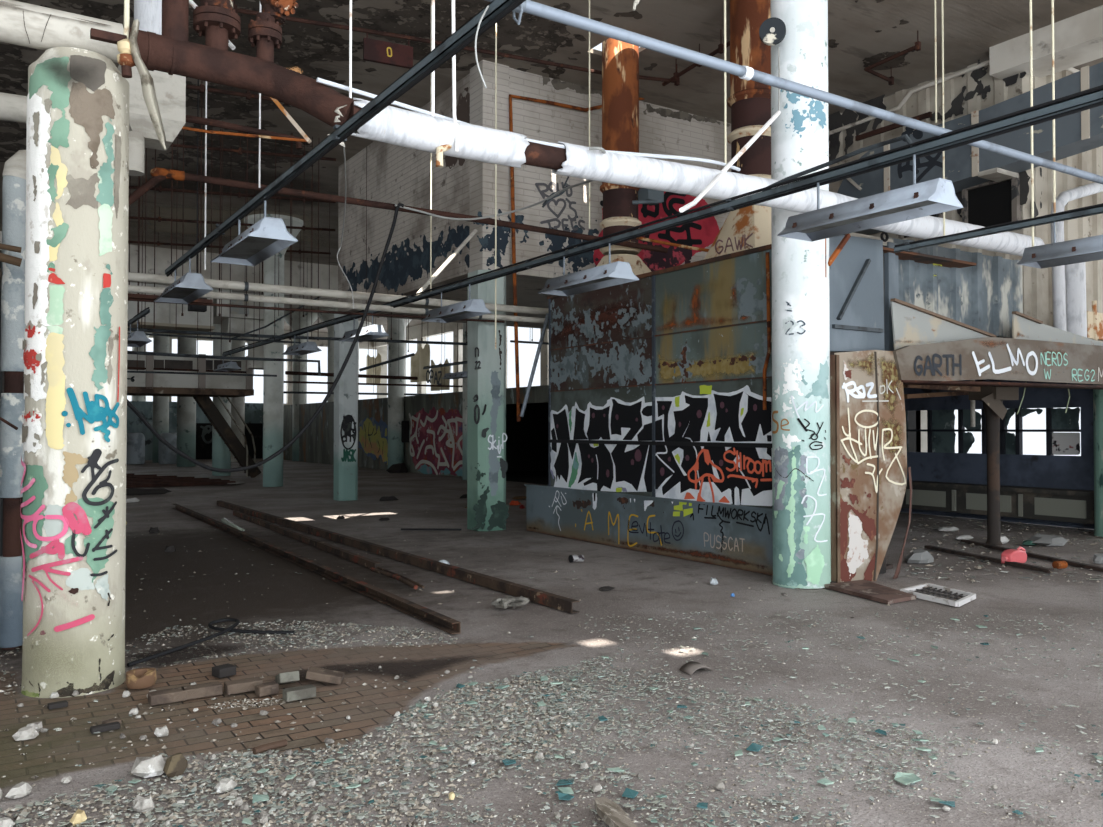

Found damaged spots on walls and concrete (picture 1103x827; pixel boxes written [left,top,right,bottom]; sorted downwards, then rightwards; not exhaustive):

peeling [15,0,134,28]
peeling [274,0,491,97]
peeling [439,3,602,96]
peeling [152,77,326,172]
peeling [780,86,886,161]
peeling [343,209,599,296]
peeling [0,42,122,601]
rust [556,304,644,340]
rust [664,286,725,329]
rust [658,342,756,382]
peeling [773,434,825,589]
peeling [840,453,876,582]